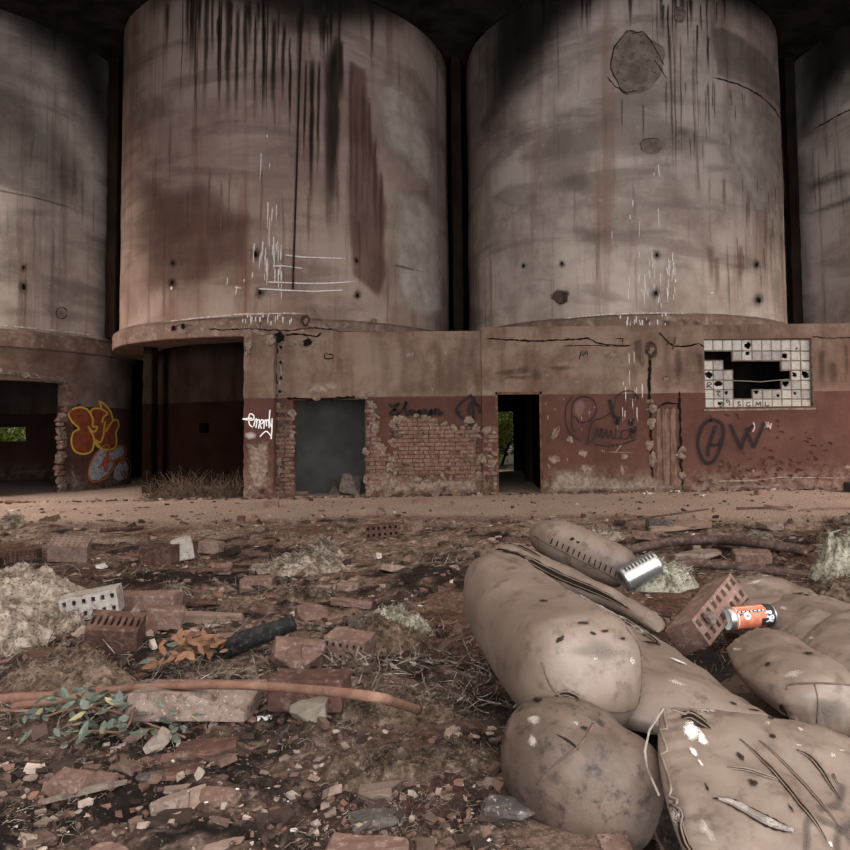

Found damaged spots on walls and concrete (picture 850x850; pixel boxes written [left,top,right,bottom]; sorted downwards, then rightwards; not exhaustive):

damp [181,0,292,113]
damp [304,39,343,189]
spalling [608,30,667,95]
crack [487,337,630,347]
crack [659,332,704,347]
flaking render [355,391,498,496]
crack [645,359,687,491]